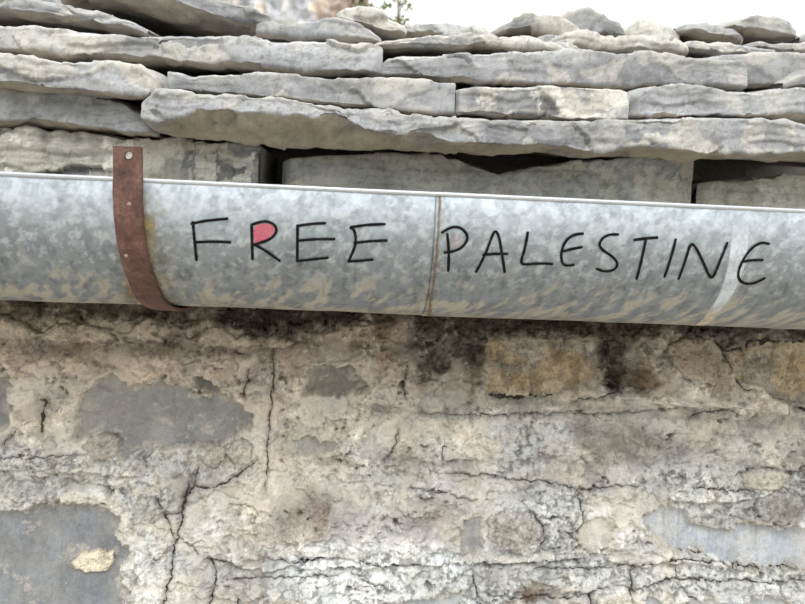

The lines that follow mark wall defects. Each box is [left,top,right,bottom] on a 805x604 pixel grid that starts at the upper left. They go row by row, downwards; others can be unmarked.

leakage [0,225,777,393]
crack [709,334,804,391]
spalling [0,375,13,432]
spalling [76,373,254,457]
crack [423,392,738,417]
crack [158,349,335,604]
spalling [0,493,131,604]
crack [360,560,420,590]
spalling [643,505,805,568]